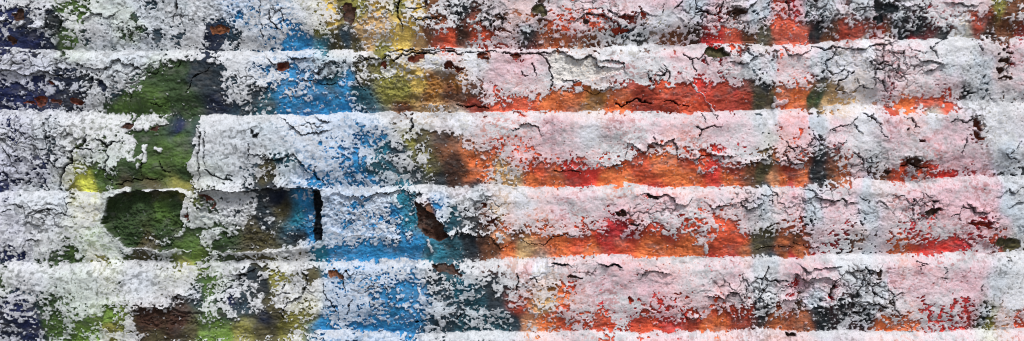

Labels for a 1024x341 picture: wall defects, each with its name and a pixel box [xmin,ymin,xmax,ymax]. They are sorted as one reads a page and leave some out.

crack [354,0,555,92]
crack [615,52,723,138]
crack [784,0,971,221]
spalling [0,25,890,338]
crack [724,241,821,303]
crack [828,274,905,318]
peeling [875,296,975,332]